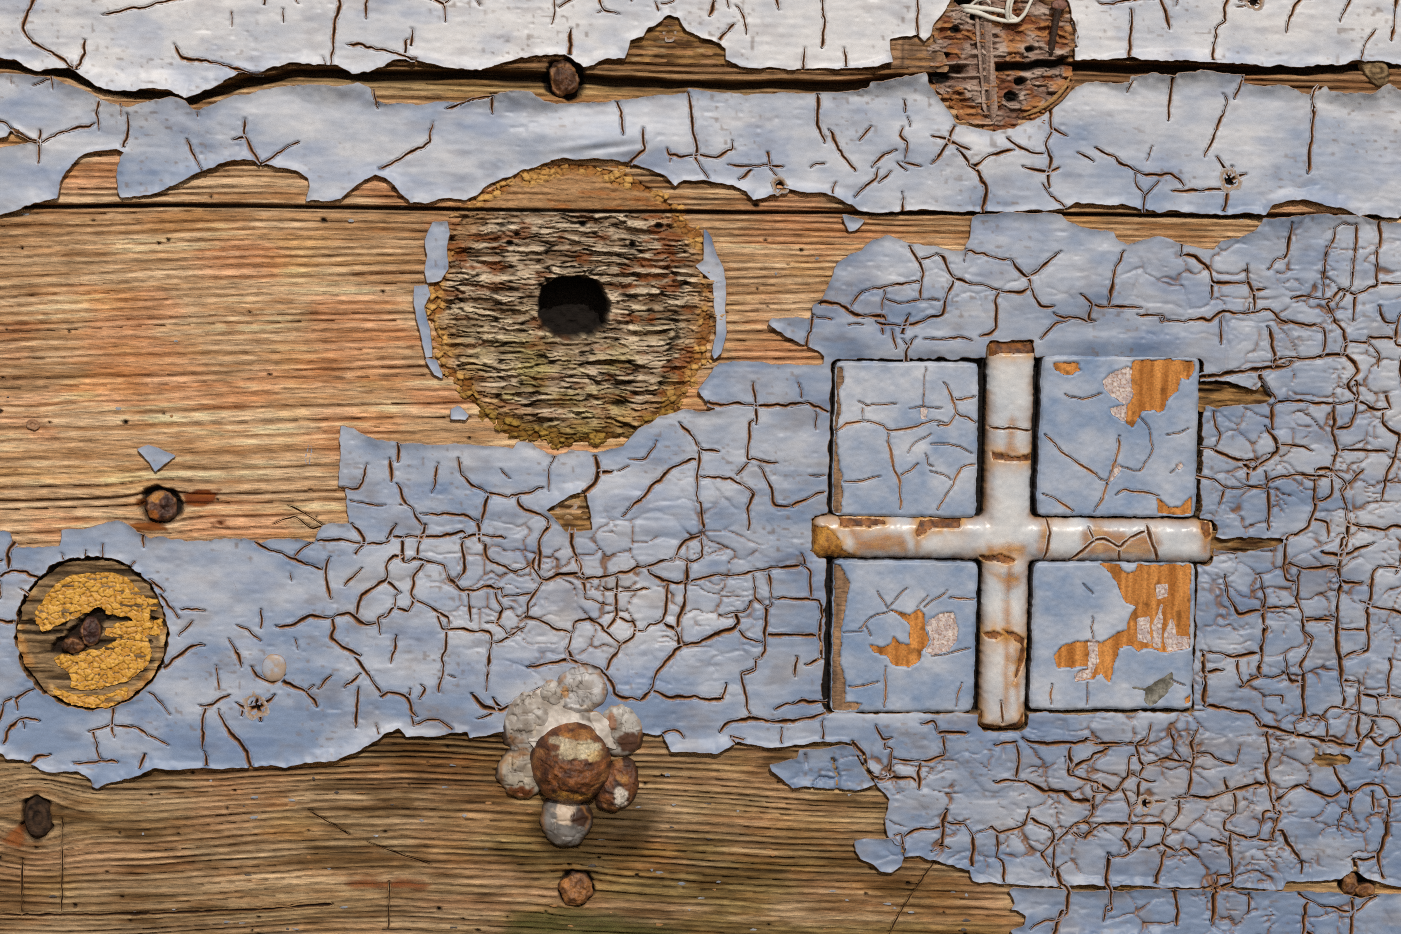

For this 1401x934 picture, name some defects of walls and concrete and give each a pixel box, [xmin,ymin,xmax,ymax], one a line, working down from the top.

crack [10,0,264,90]
crack [323,0,480,64]
peeling [0,0,951,98]
peeling [1067,0,1401,68]
crack [615,0,1245,213]
corrosion [988,341,1034,356]
peeling [0,69,1401,789]
corrosion [992,452,1031,462]
crack [0,221,1401,934]
corrosion [813,517,961,557]
peeling [528,395,1401,934]
corrosion [983,628,1025,678]